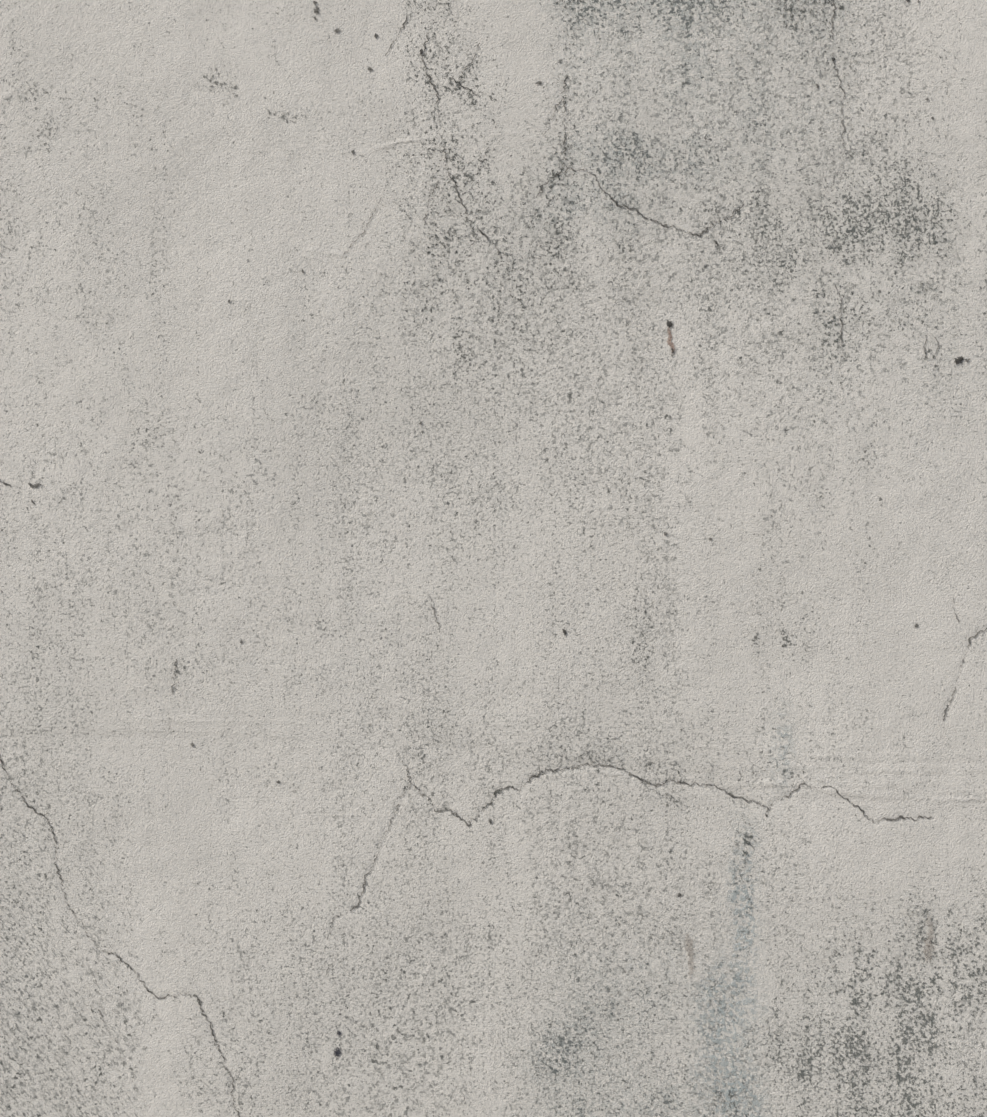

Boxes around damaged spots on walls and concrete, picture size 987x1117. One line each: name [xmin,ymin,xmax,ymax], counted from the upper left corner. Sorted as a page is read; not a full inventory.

crack [536,75,744,237]
crack [943,598,987,721]
crack [0,755,240,1117]
crack [326,761,932,972]